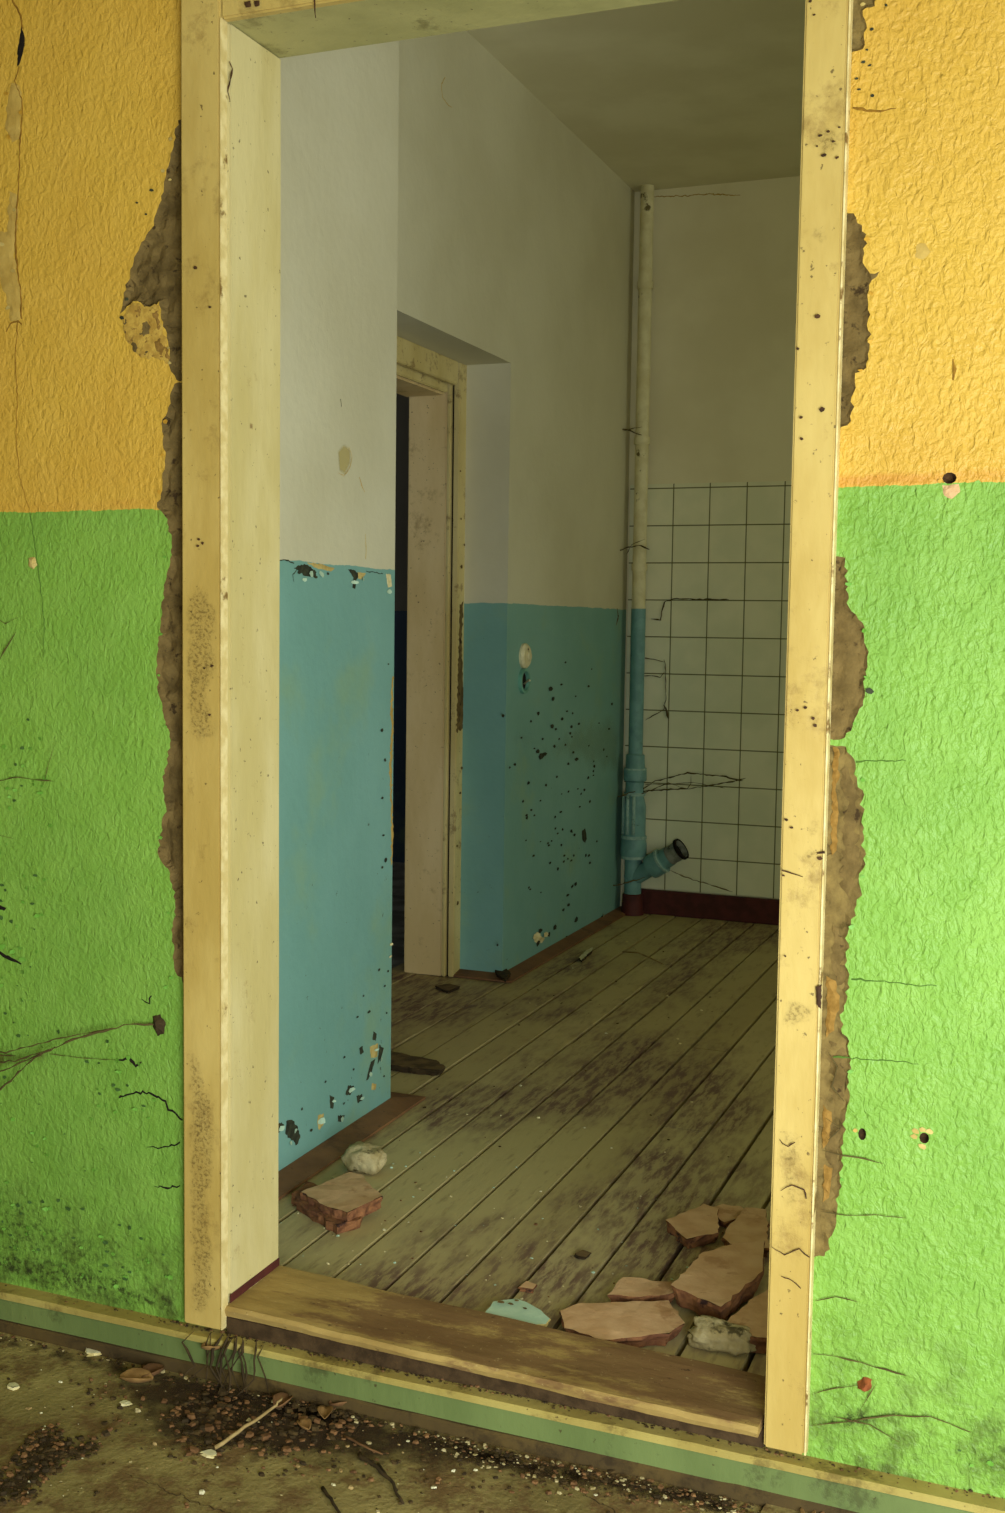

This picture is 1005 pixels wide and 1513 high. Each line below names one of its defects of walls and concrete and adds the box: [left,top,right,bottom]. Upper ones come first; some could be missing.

flaking render [852,0,888,97]
crack [12,0,45,657]
flaking render [840,213,879,427]
flaking render [120,120,183,1004]
peeling [280,559,392,594]
spalling [381,663,394,869]
flaking render [814,556,874,1257]
peeling [119,1090,183,1120]
peeling [278,1031,385,1145]